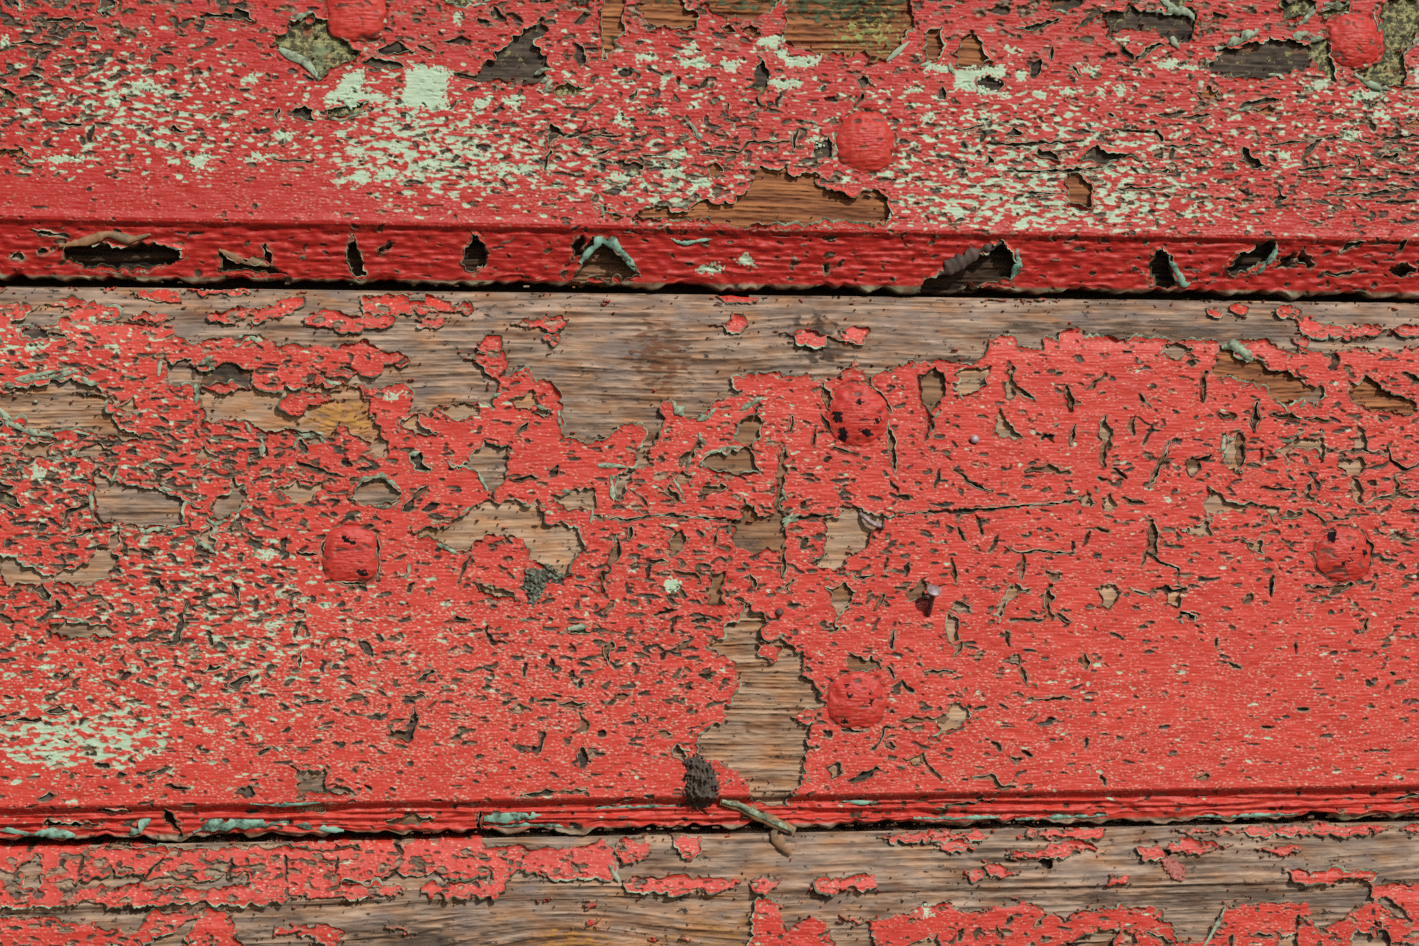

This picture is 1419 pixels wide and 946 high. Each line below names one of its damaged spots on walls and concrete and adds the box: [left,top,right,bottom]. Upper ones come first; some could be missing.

peeling [251,0,1419,169]
peeling [0,121,1419,581]
peeling [0,364,251,642]
peeling [595,534,625,596]
peeling [808,506,895,633]
crack [788,360,1419,722]
peeling [0,571,1419,946]
crack [823,559,1032,809]
crack [1194,773,1211,782]
crack [1261,707,1308,728]
crack [226,858,235,882]
crack [381,844,403,882]